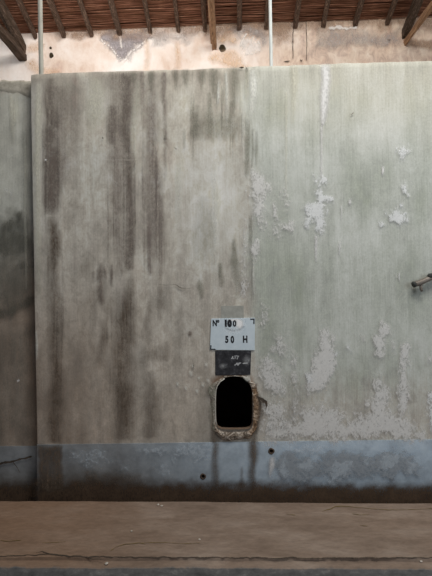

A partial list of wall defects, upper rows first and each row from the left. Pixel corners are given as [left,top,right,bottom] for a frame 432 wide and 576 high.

leakage [212,54,258,114]
leakage [36,92,58,209]
leakage [321,65,330,176]
peeling [245,168,295,238]
peeling [305,174,333,234]
peeling [379,204,409,227]
leakage [50,225,58,267]
leakage [0,356,432,504]
peeling [196,328,432,485]
crack [0,456,32,471]
crack [1,541,432,560]